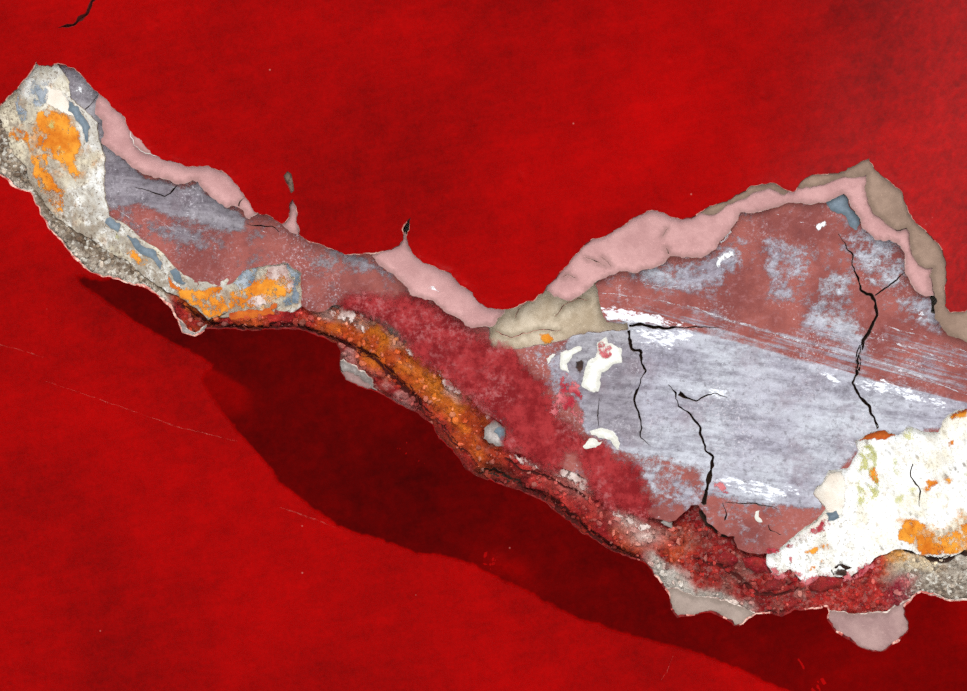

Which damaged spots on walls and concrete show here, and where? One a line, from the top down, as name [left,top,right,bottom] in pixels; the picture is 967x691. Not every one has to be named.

crack [63,0,94,27]
spalling [0,64,302,335]
peeling [101,143,967,651]
crack [627,322,716,440]
crack [668,384,779,538]
crack [838,234,902,428]
crack [696,558,798,597]